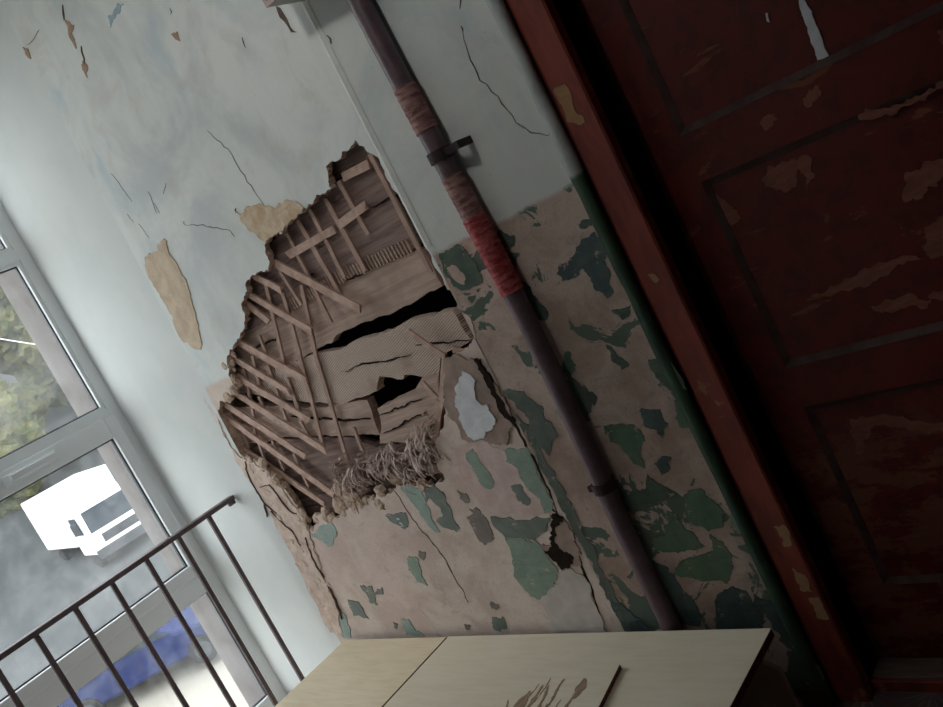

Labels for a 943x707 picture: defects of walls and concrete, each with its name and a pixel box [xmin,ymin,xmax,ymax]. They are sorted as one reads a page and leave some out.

crack [459,0,549,136]
crack [113,176,166,236]
crack [208,131,264,205]
spalling [144,239,202,350]
spalling [218,143,651,638]
crack [514,422,558,514]
crack [357,491,467,600]
crack [580,558,601,615]